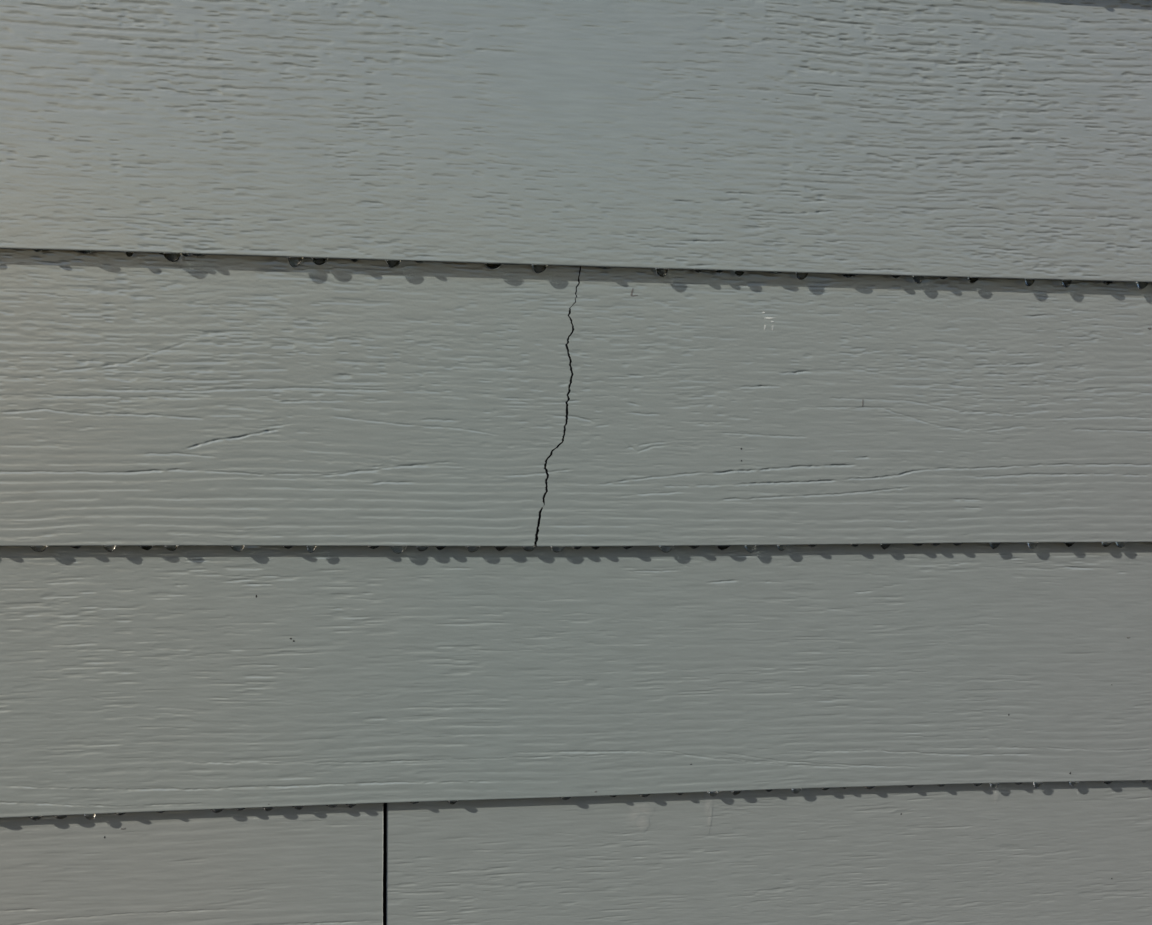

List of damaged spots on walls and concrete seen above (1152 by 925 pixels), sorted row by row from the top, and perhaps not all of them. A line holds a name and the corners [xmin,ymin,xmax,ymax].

crack [534,266,581,545]